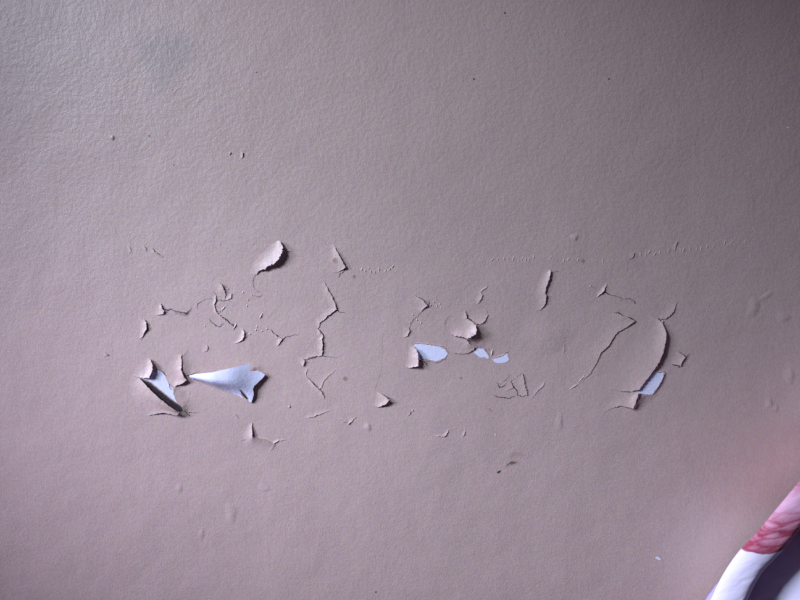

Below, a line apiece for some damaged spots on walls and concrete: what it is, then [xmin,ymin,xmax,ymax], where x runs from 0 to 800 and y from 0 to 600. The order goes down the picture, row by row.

peeling [248,241,299,298]
peeling [329,245,345,277]
peeling [535,269,558,311]
peeling [129,344,265,416]
crack [150,281,356,424]
peeling [373,392,390,407]
peeling [402,285,511,368]
peeling [569,301,690,412]